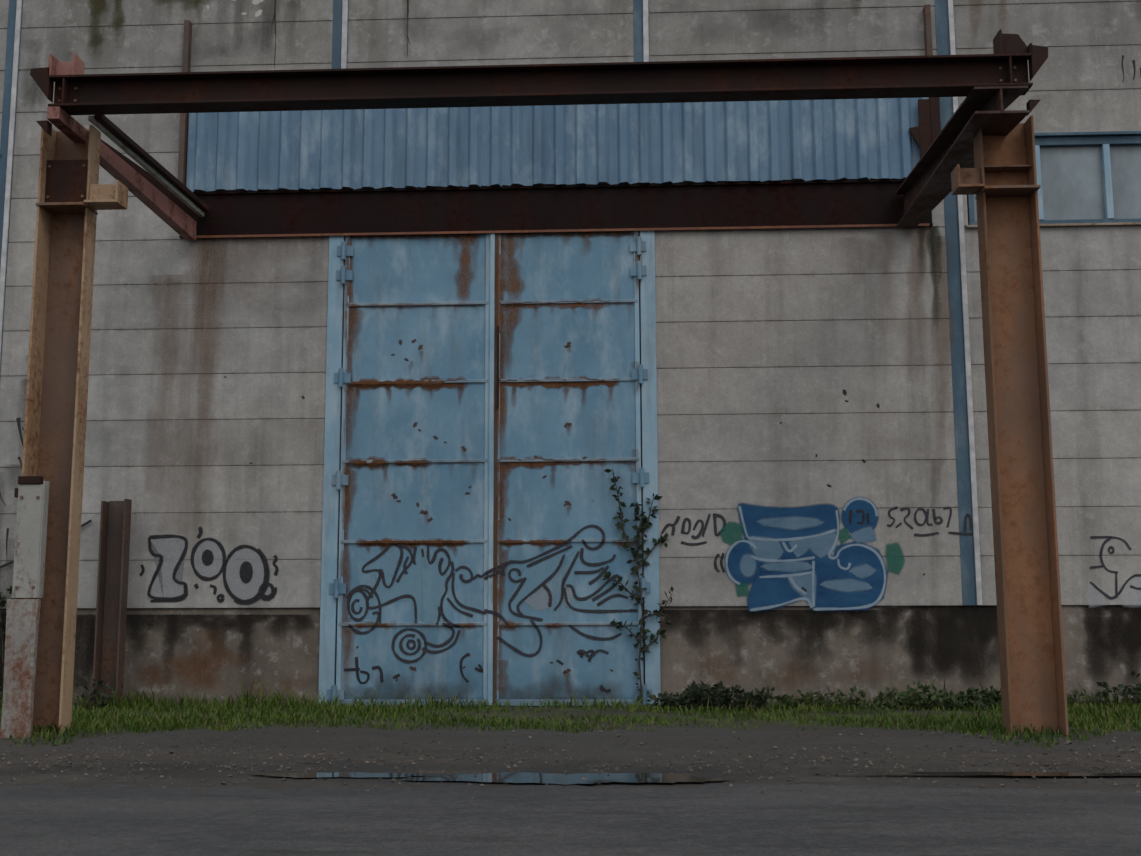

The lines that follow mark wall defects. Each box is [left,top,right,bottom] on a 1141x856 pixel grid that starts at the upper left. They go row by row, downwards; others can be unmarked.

damp [90,0,122,48]
corrosion [346,234,475,417]
corrosion [496,232,639,429]
corrosion [342,458,467,579]
damp [126,614,310,650]
damp [664,605,999,678]
damp [1086,605,1141,679]